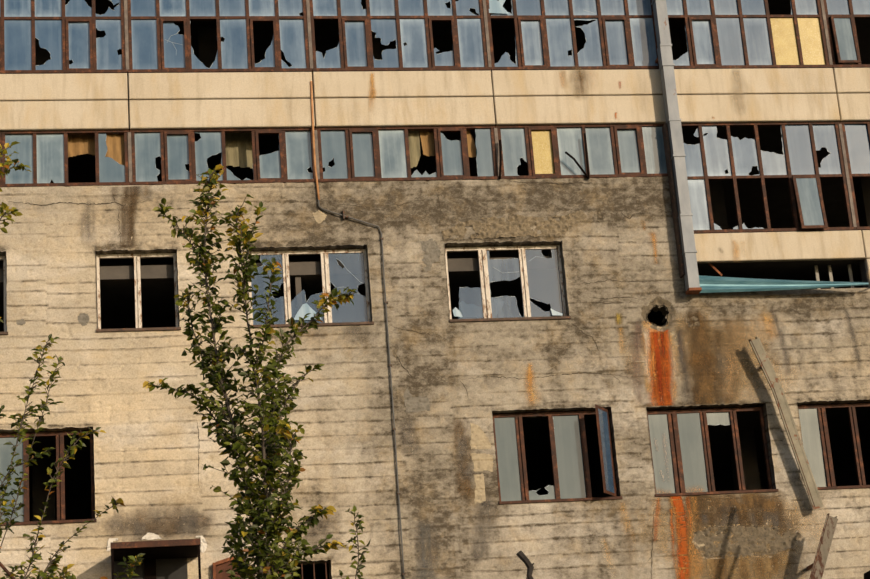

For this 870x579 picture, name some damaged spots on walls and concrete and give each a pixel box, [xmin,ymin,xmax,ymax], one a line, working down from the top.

leakage [121,186,149,248]
spalling [641,296,676,332]
crack [461,325,629,395]
rust [644,323,674,406]
leakage [678,311,742,404]
rust [657,496,693,579]
spalling [692,525,802,559]